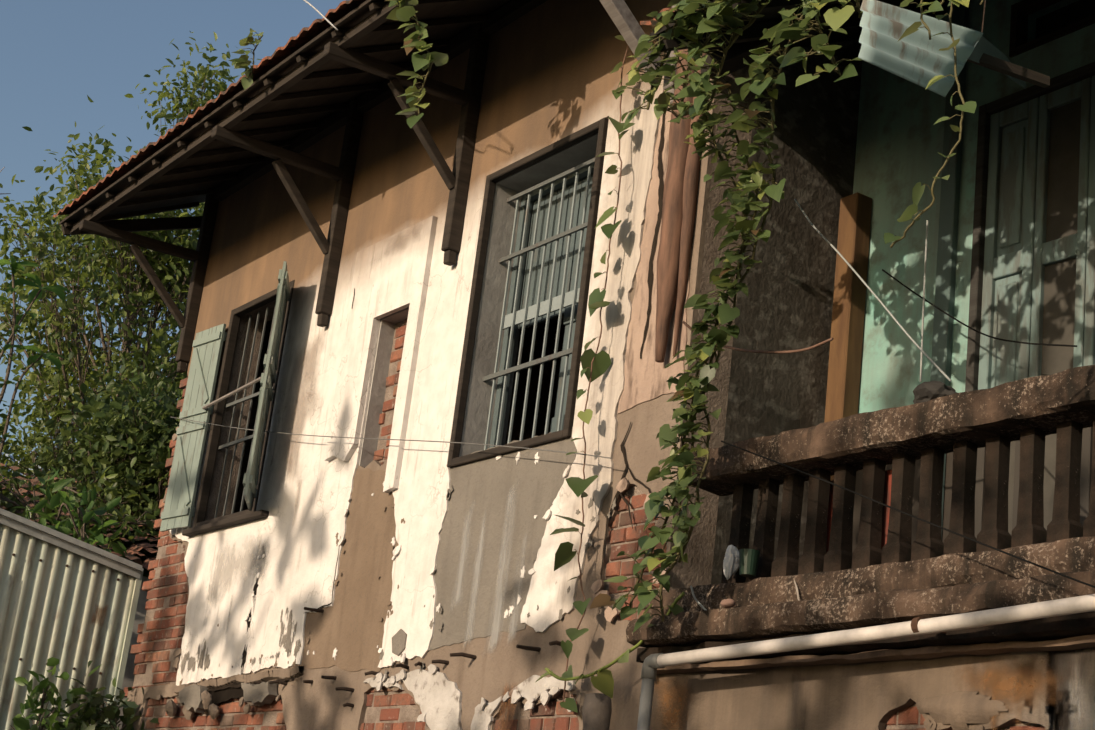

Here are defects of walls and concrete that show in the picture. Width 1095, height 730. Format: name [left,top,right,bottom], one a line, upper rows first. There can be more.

peeling [274,318,579,730]
flaking render [576,477,668,622]
flaking render [870,702,937,730]